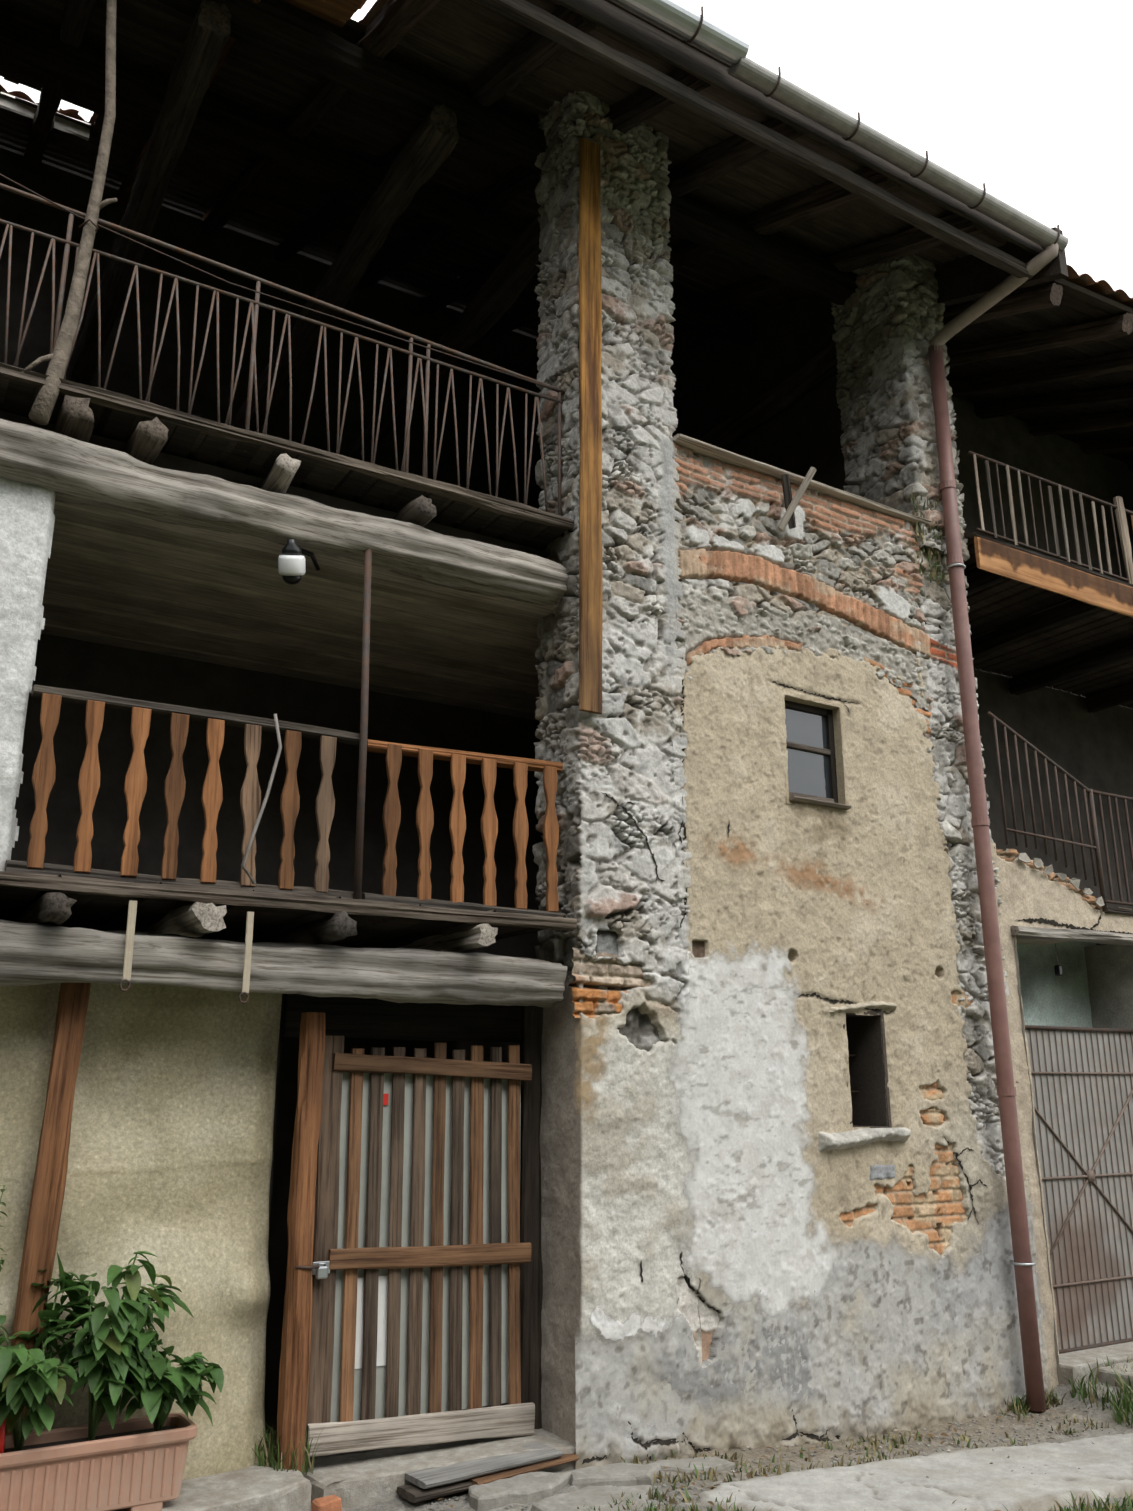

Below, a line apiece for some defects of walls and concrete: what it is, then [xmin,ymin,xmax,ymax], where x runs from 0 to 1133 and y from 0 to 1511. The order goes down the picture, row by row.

crack [677,1252,724,1313]
peeling [568,941,967,1362]